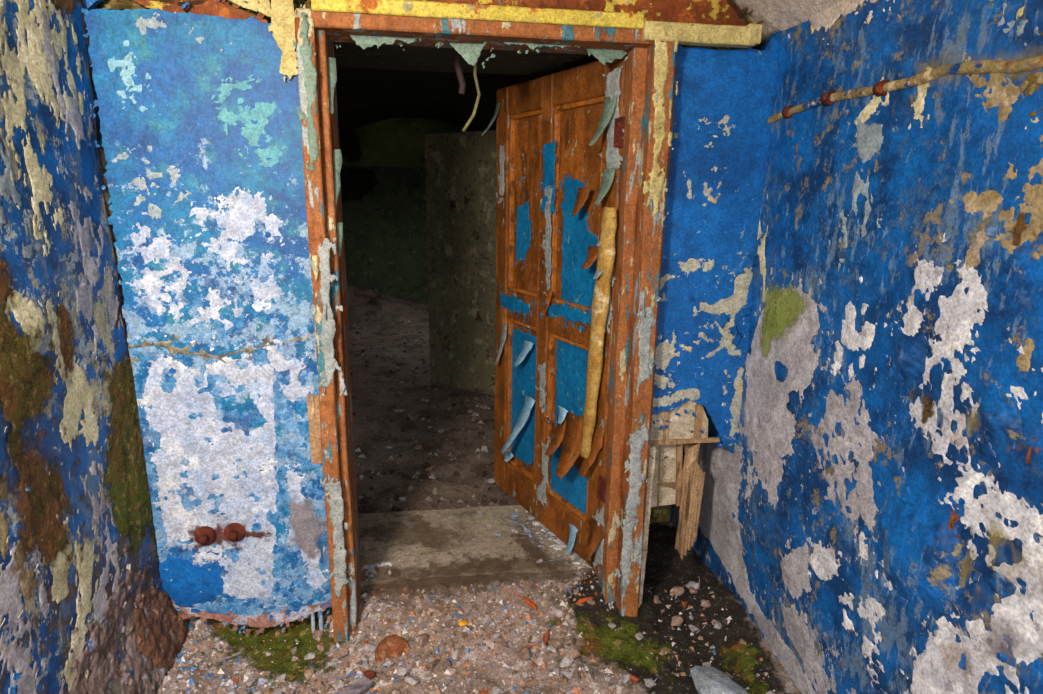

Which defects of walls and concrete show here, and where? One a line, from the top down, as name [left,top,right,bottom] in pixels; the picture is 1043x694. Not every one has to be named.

peeling [327,35,341,114]
peeling [350,35,421,51]
peeling [436,41,627,72]
peeling [732,0,901,45]
peeling [962,52,1043,122]
peeling [828,67,931,283]
peeling [0,0,329,694]
peeling [500,168,617,479]
damp [760,286,806,357]
damp [0,337,55,464]
peeling [642,158,1043,694]
rust [179,521,272,552]